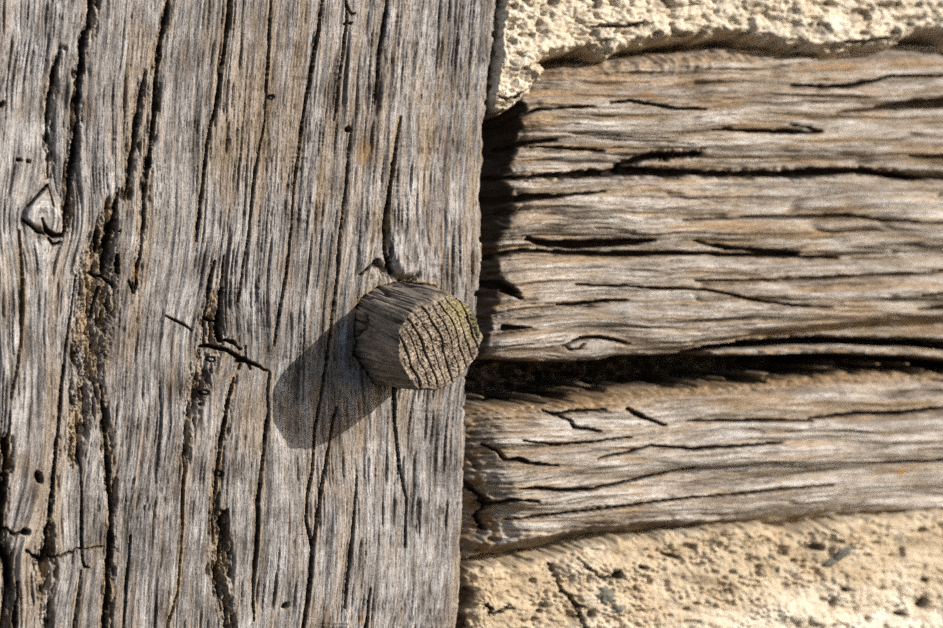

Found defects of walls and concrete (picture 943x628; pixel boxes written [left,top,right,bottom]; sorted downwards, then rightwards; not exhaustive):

crack [374,0,389,105]
crack [381,115,403,267]
crack [164,0,356,628]
crack [463,74,943,532]
crack [342,475,372,628]
crack [546,557,623,628]